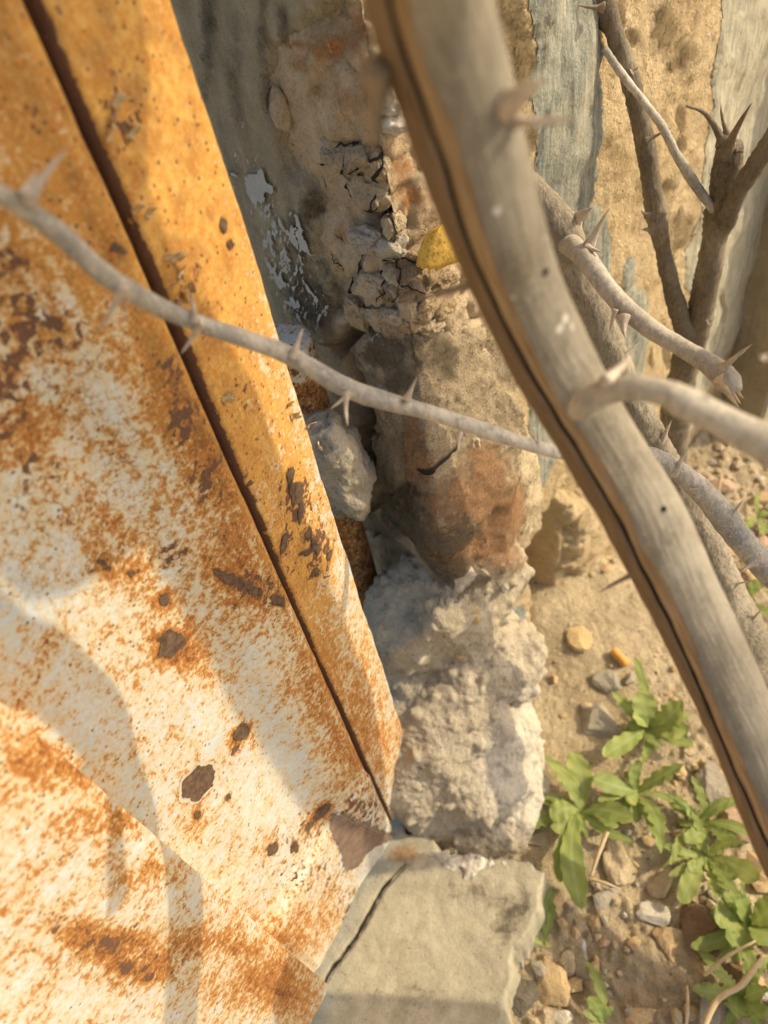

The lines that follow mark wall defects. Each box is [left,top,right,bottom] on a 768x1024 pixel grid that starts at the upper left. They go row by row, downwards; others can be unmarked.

peeling [226,153,328,343]
crack [319,142,426,309]
crack [325,865,404,982]